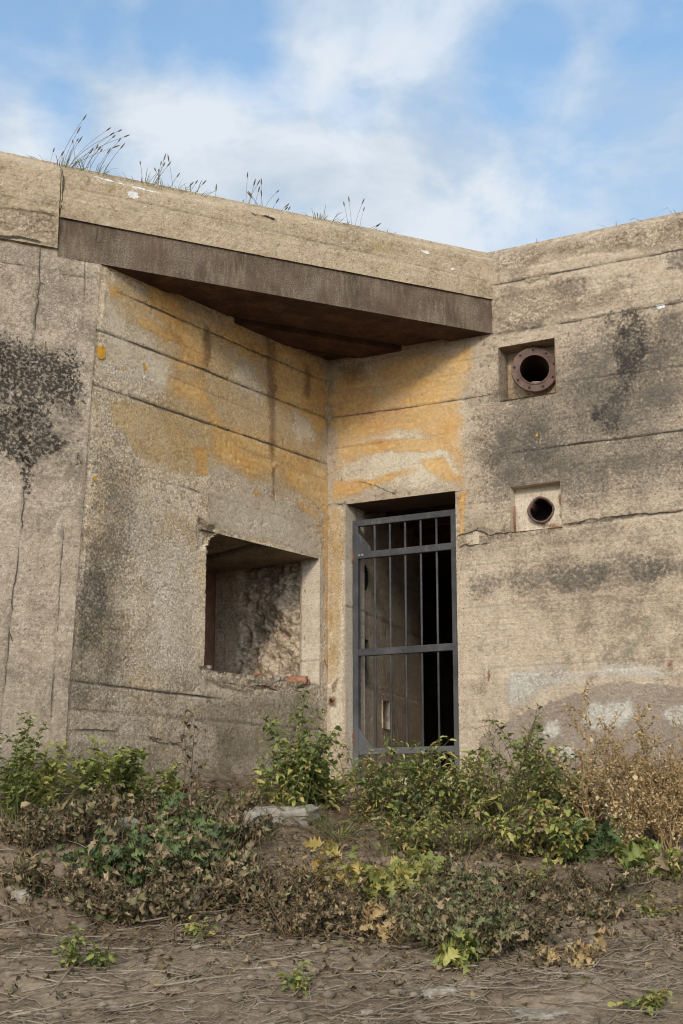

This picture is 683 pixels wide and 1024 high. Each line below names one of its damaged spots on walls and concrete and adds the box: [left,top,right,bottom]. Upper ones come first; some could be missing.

crack [2,481,26,693]
damp [0,284,470,696]
crack [456,527,510,548]
damp [489,304,683,506]
crack [568,510,682,524]